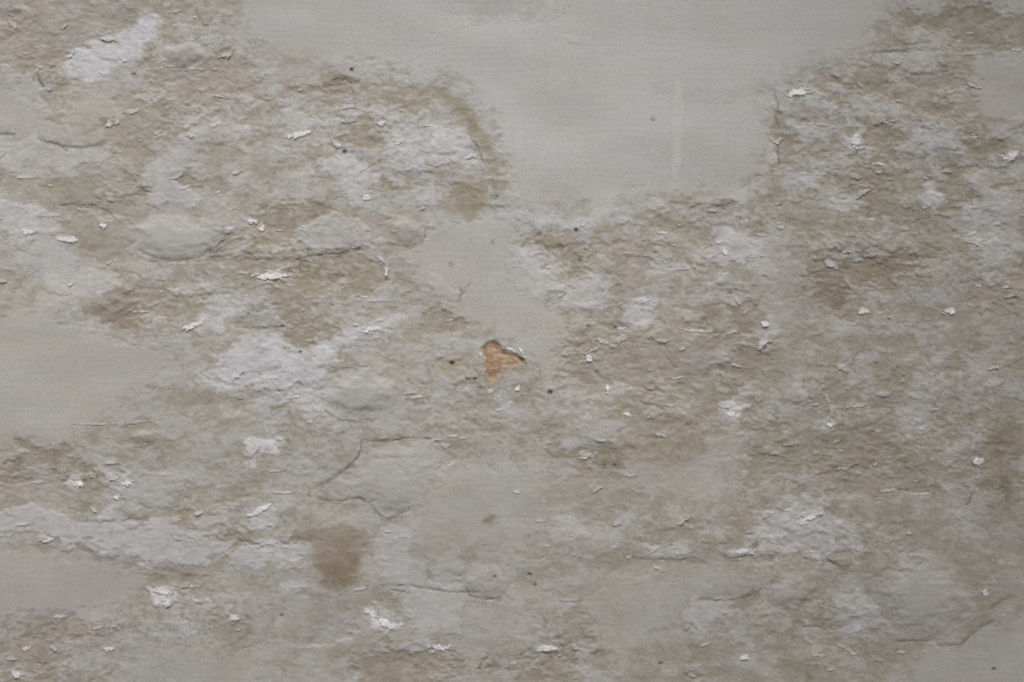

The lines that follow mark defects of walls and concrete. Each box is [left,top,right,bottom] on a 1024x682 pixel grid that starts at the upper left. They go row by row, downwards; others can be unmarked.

peeling [0,0,279,271]
peeling [320,89,392,157]
peeling [525,0,1024,438]
peeling [202,190,532,467]
peeling [0,435,114,516]
crack [308,410,437,521]
peeling [511,420,645,521]
peeling [804,363,942,504]
peeling [595,513,718,578]
peeling [0,612,119,682]
peeling [343,637,471,682]
peeling [508,598,614,682]